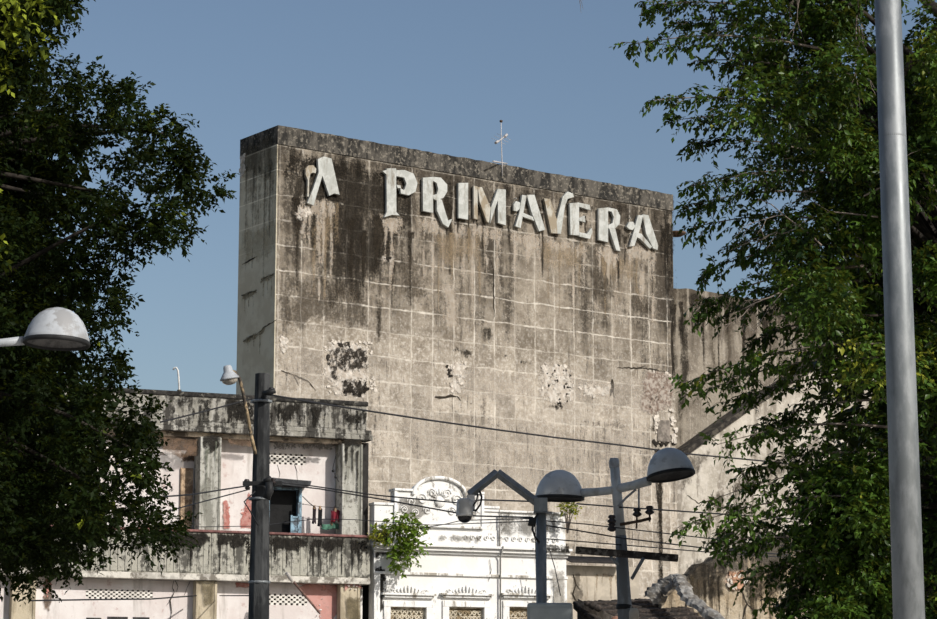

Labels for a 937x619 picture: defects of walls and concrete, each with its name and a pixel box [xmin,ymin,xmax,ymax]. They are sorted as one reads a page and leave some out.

water stain [284,146,586,337]
water stain [598,200,705,418]
peeling [322,336,378,398]
peeling [445,361,467,394]
peeling [538,361,615,408]
water stain [270,402,326,428]
water stain [274,442,334,450]
water stain [345,410,367,499]
water stain [160,533,250,572]